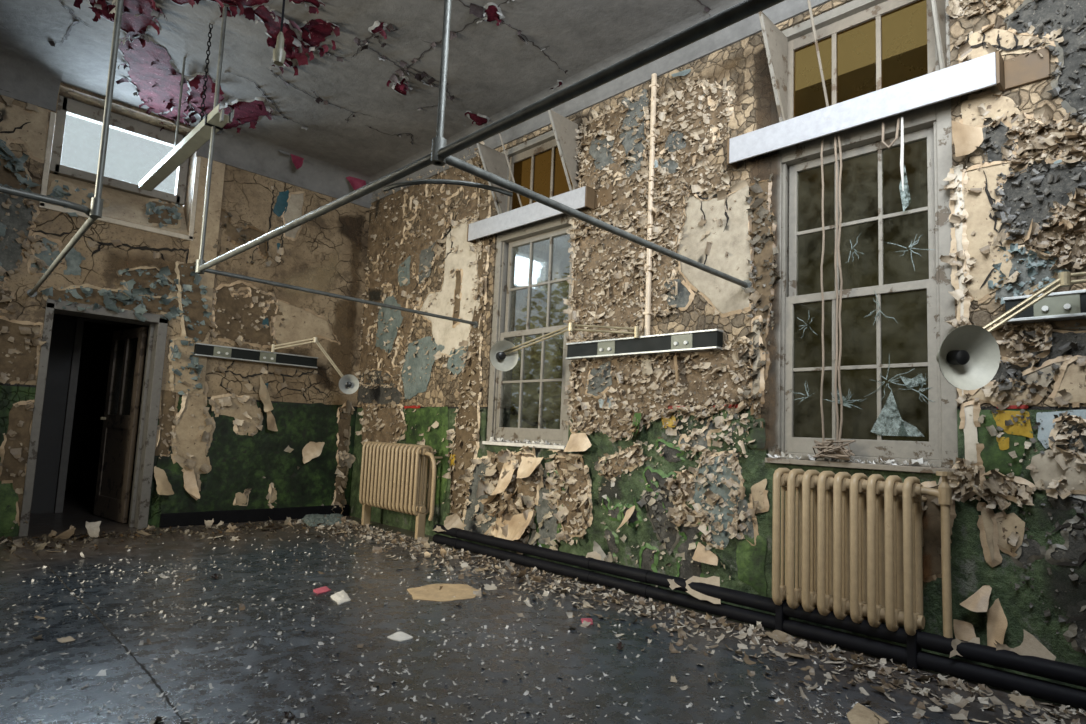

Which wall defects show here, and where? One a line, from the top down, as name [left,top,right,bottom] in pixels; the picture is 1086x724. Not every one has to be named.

crack [0,112,30,133]
peeling [73,0,340,136]
peeling [368,21,390,39]
crack [225,0,568,144]
peeling [483,2,505,26]
peeling [0,95,341,500]
peeling [279,69,781,587]
flaking render [0,400,35,529]
flaking render [233,488,251,506]
flaking render [263,476,277,509]